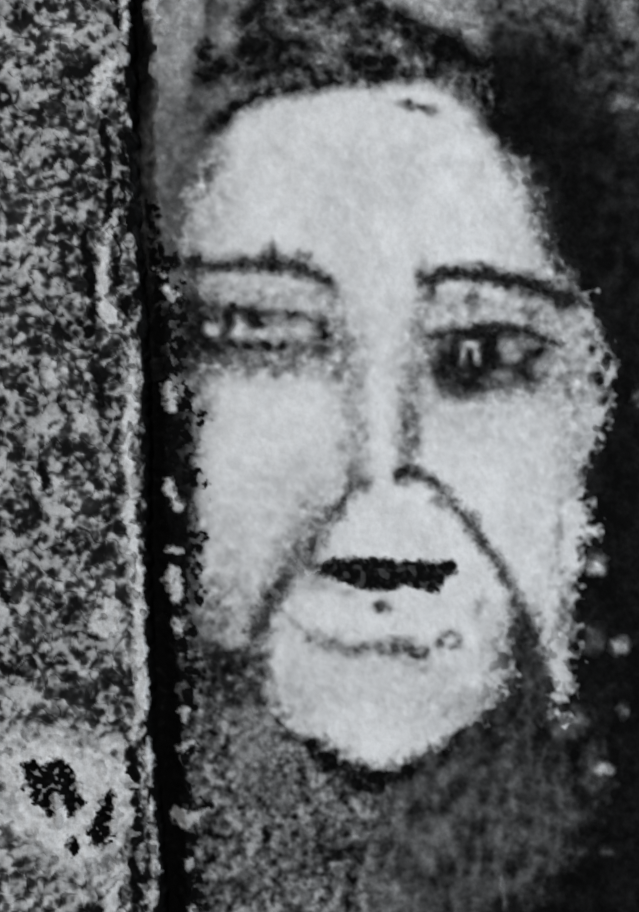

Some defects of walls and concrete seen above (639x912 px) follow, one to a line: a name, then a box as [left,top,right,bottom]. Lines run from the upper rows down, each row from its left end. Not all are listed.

spalling [120,0,129,41]
spalling [87,56,120,105]
spalling [96,210,121,327]
crack [79,0,216,912]
spalling [0,339,154,912]
spalling [147,887,158,909]